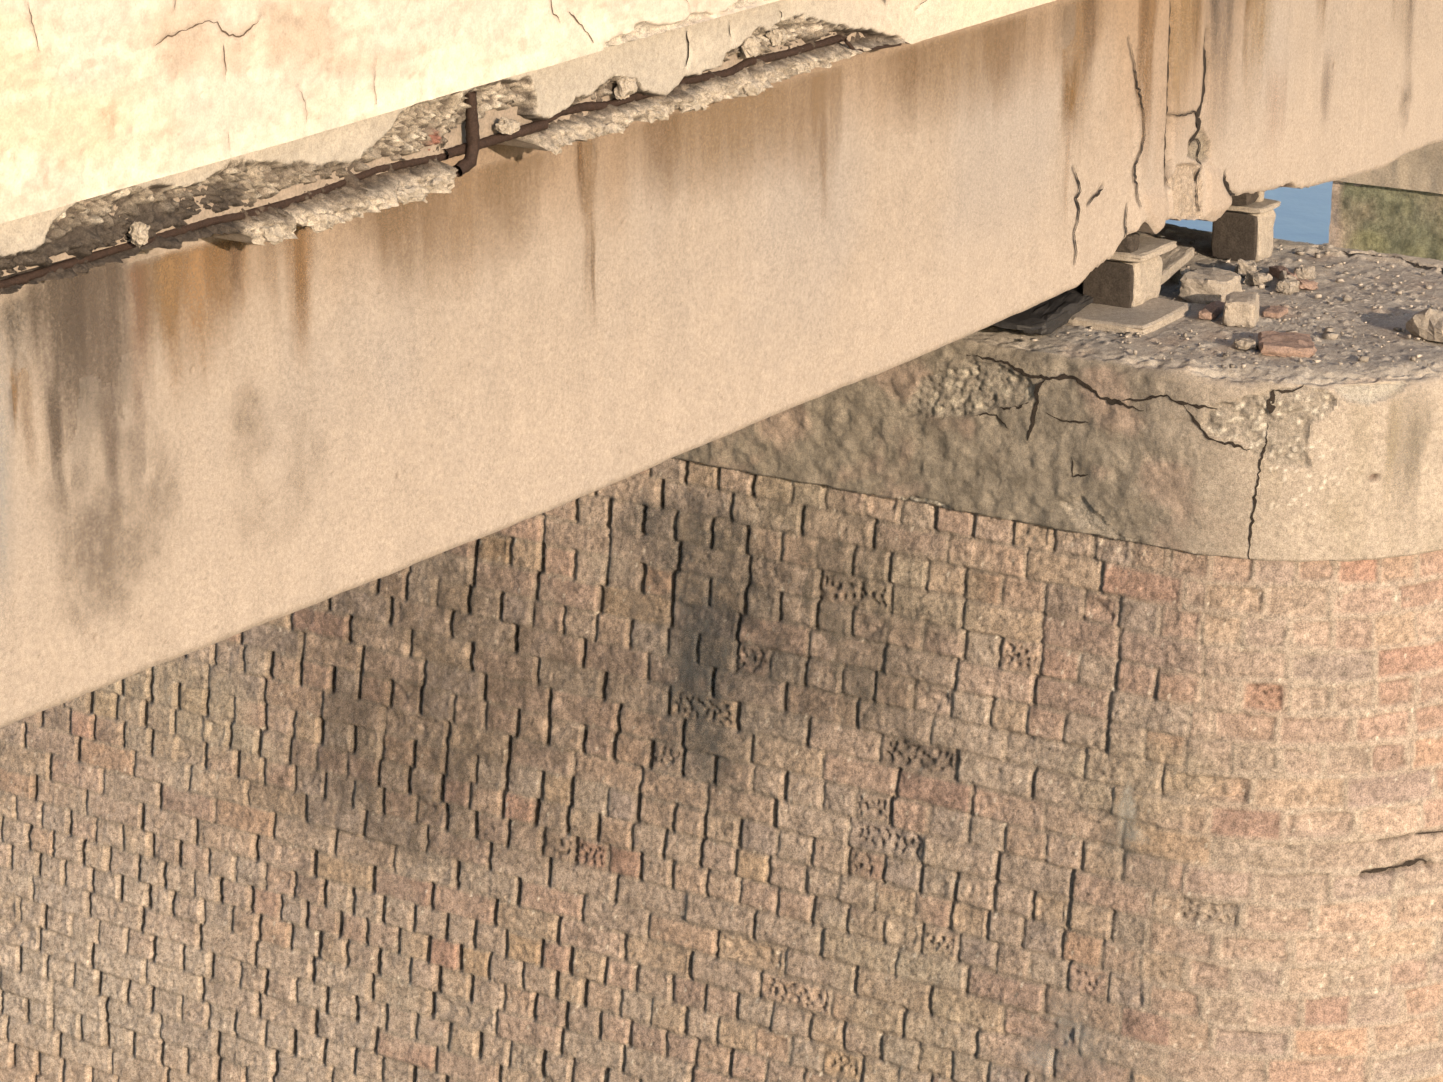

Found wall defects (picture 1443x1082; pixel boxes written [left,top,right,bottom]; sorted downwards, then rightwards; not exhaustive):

crack [155,2,260,75]
crack [551,0,594,43]
spalling [604,0,769,48]
spalling [0,13,905,295]
crack [1074,8,1235,262]
corrosion [138,241,246,335]
corrosion [272,226,310,318]
damp [33,262,141,461]
crack [966,355,1304,559]
spalling [1200,384,1409,469]
crack [1361,831,1443,874]